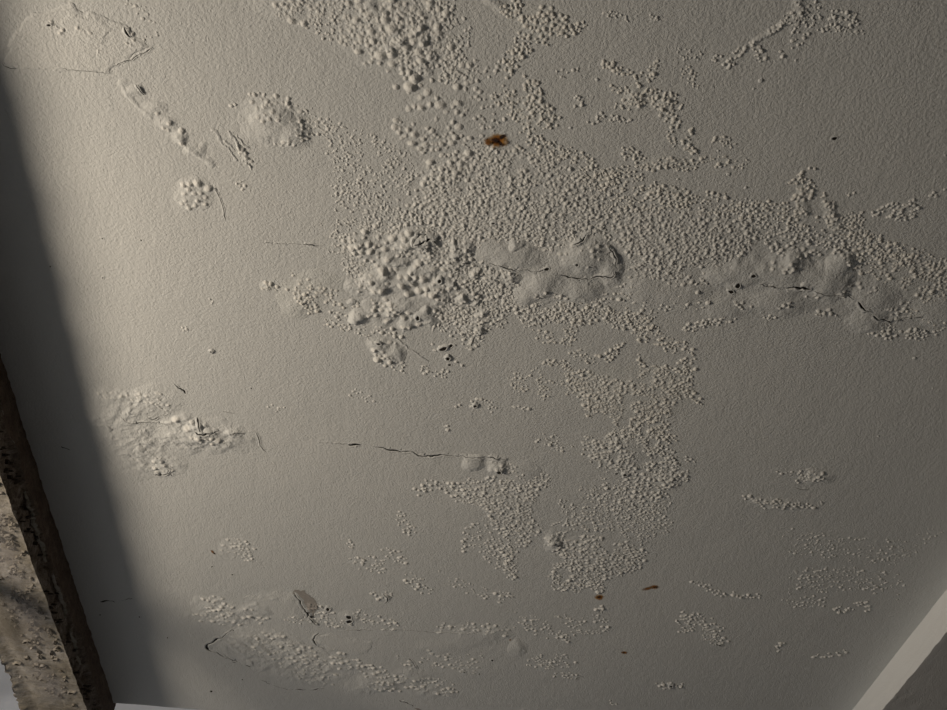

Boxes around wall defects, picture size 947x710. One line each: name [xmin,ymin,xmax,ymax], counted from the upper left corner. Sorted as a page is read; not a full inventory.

corrosion [485,134,506,147]
crack [460,229,619,282]
crack [759,282,923,325]
crack [318,441,508,463]
peeling [293,590,329,618]